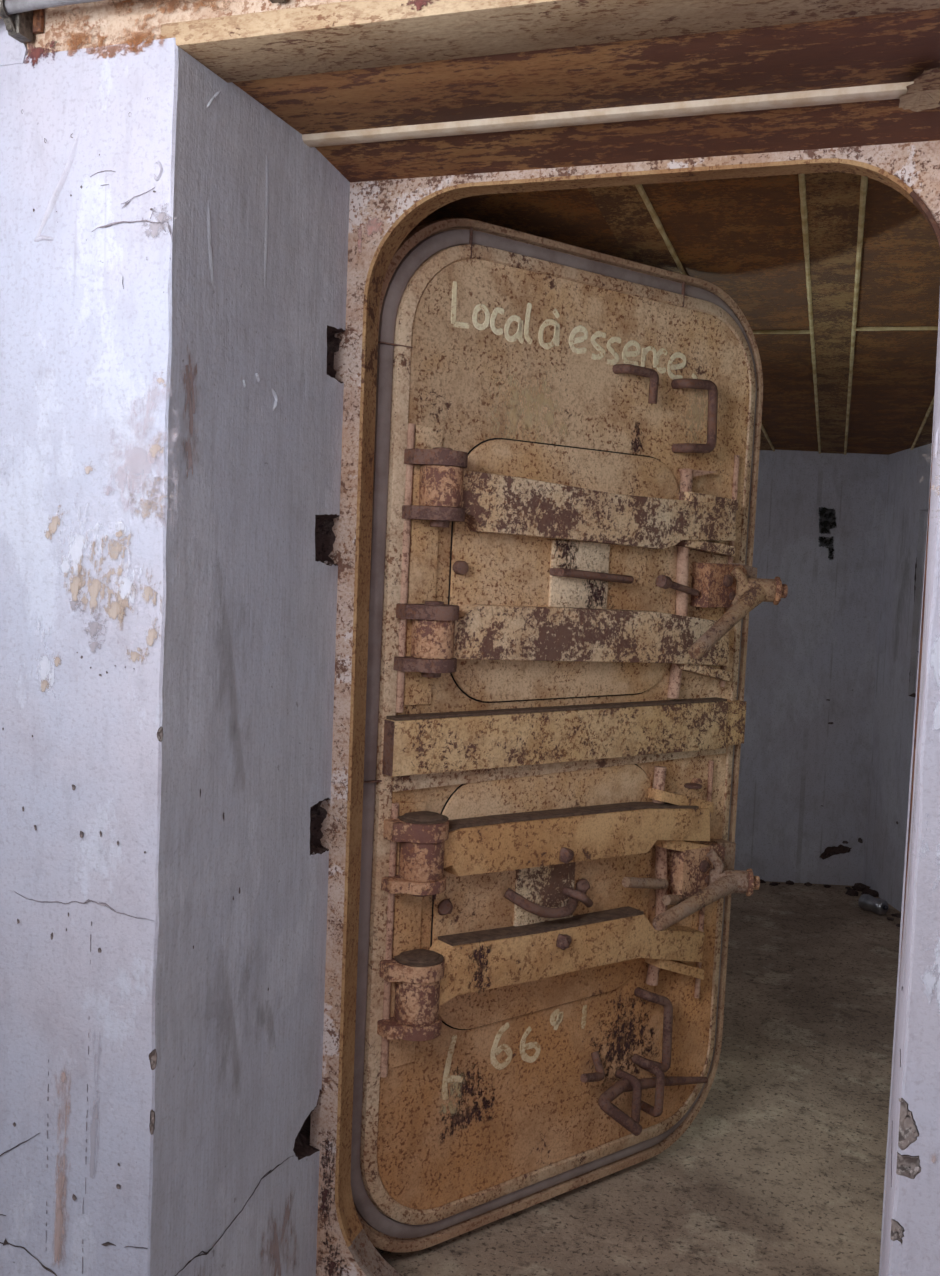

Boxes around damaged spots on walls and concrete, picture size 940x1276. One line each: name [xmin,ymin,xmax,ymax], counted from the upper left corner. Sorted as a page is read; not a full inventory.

corrosion [64,0,228,58]
peeling [46,504,157,623]
peeling [38,621,61,692]
peeling [76,619,157,676]
crack [15,892,149,920]
peeling [923,938,940,1008]
spalling [896,1098,921,1178]
crack [0,1214,57,1276]
crack [176,1156,292,1275]
spalling [891,1219,904,1243]